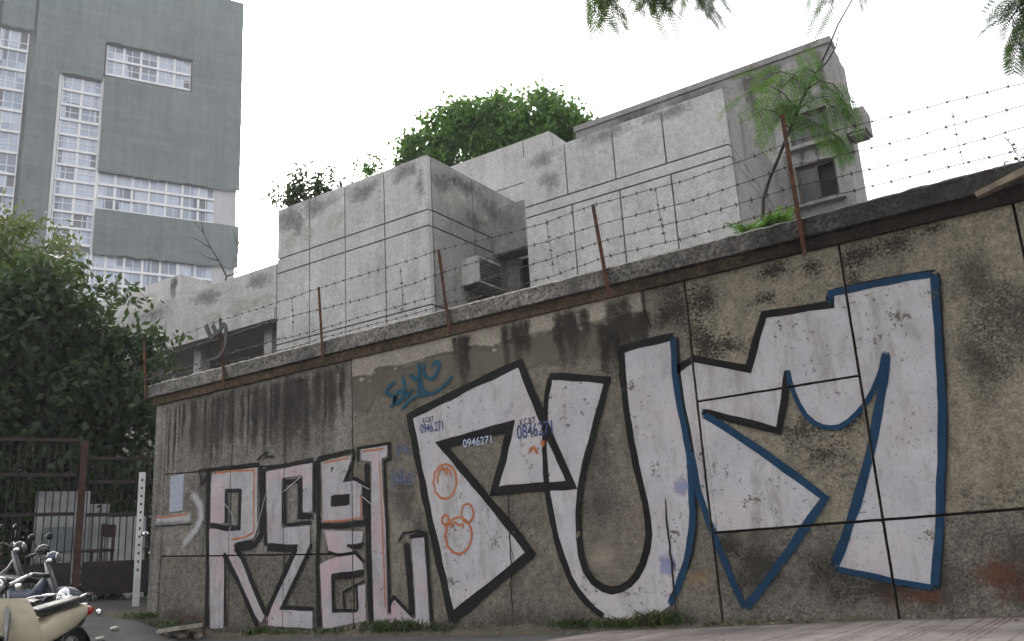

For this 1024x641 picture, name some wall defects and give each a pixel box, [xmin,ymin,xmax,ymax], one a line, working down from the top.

damp [452,337,469,381]
damp [501,321,529,365]
damp [167,368,345,475]